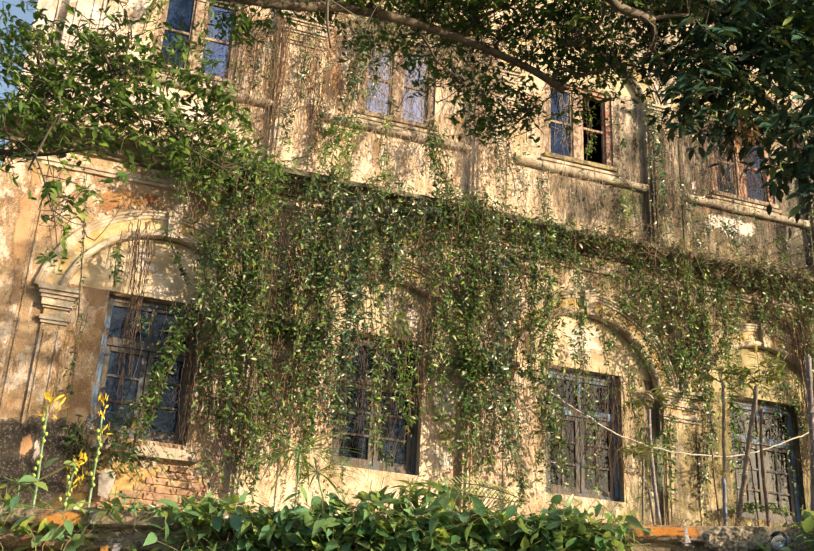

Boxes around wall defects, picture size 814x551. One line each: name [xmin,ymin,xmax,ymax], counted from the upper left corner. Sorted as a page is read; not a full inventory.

peeling [90,183,159,214]
peeling [709,215,753,238]
mould [0,415,85,508]
spalling [70,439,208,523]